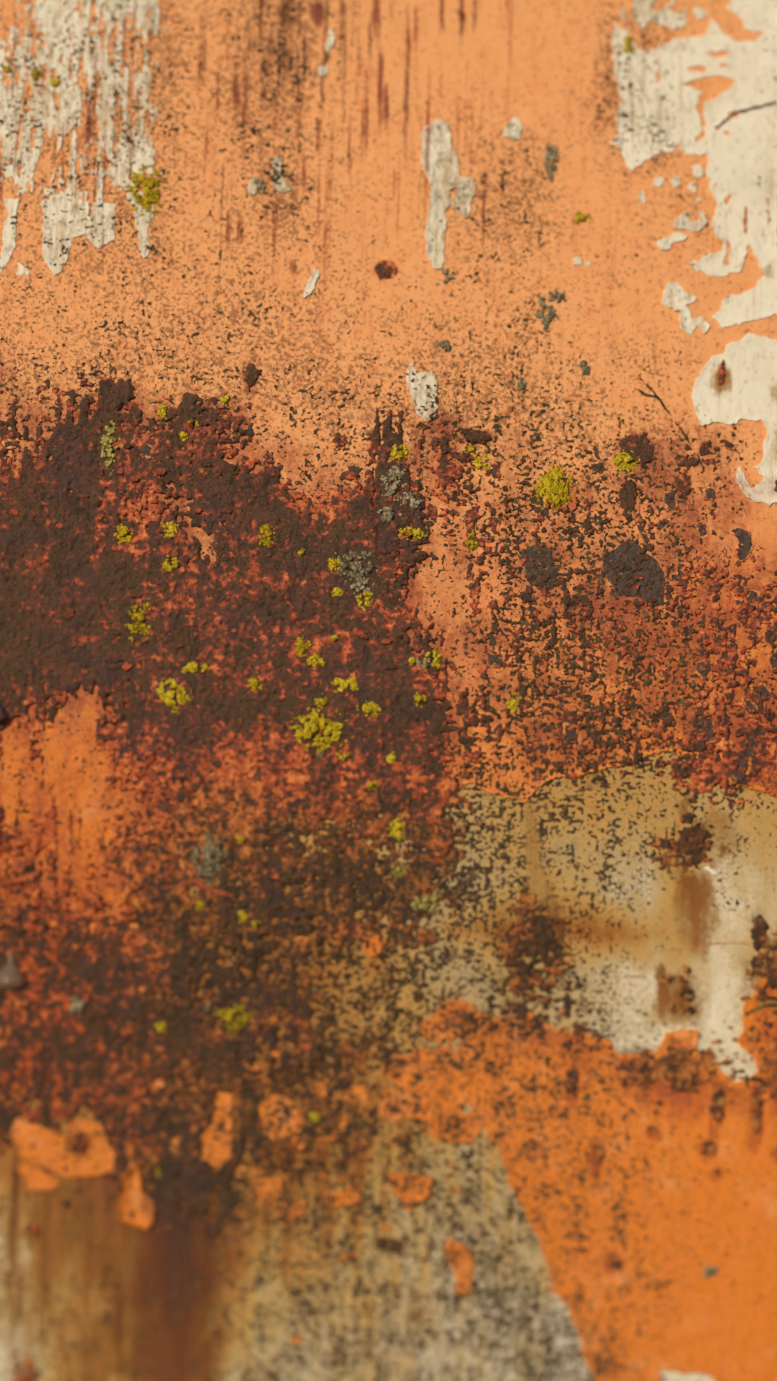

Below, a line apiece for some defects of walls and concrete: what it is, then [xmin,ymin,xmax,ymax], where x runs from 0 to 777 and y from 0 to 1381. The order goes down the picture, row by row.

peeling [0,0,167,276]
rust [374,260,397,279]
peeling [421,119,476,270]
peeling [610,0,777,506]
rust [0,359,777,1381]
peeling [428,836,777,1082]
peeling [0,1118,154,1296]
peeling [217,1104,594,1381]
peeling [658,1370,714,1381]